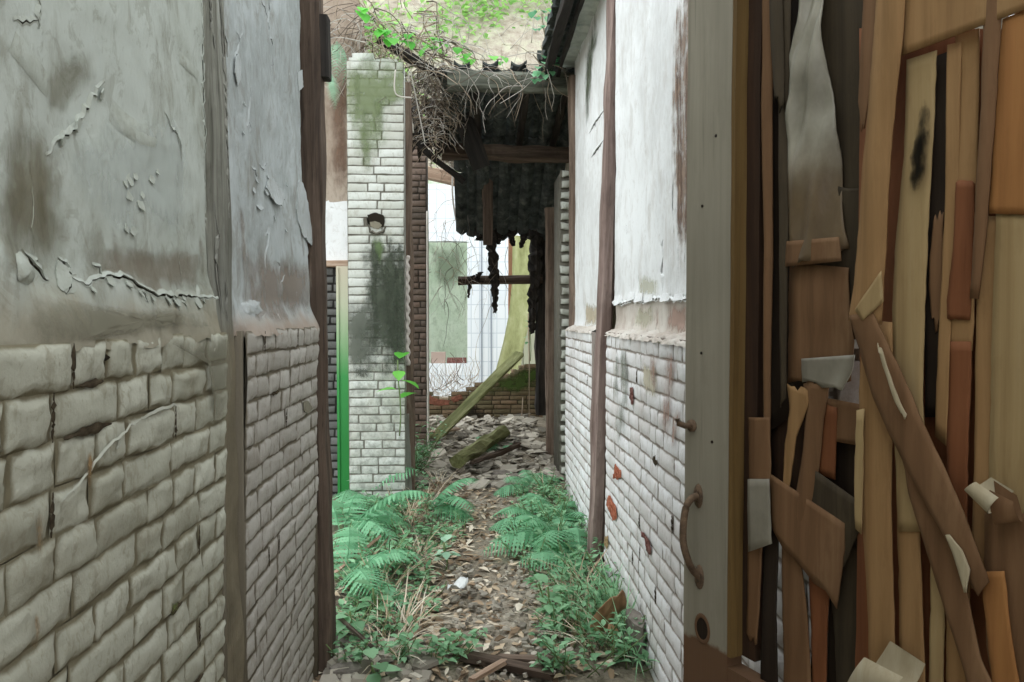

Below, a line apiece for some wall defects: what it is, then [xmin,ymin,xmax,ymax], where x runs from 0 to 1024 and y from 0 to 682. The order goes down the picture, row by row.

peeling [45,79,105,157]
water stain [11,149,47,236]
peeling [105,135,179,212]
flaking render [252,174,313,246]
spalling [54,256,77,294]
water stain [348,240,405,377]
flaking render [612,292,686,306]
crack [61,403,176,503]